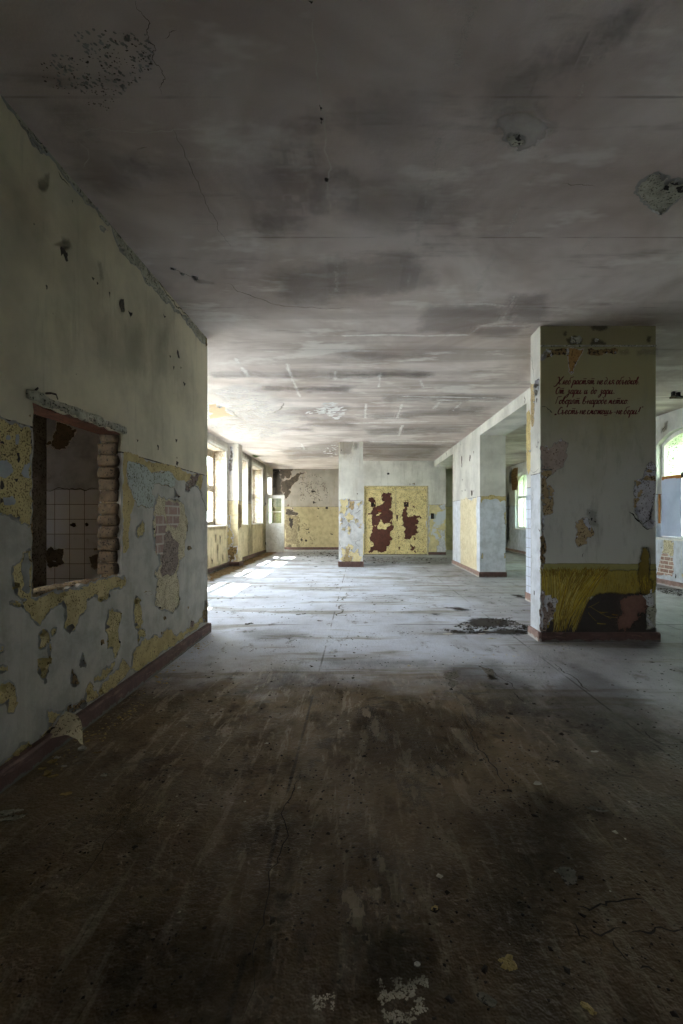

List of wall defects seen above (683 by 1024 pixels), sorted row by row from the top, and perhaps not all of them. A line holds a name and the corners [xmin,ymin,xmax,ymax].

spalling [41,28,153,109]
spalling [633,171,683,215]
crack [170,267,198,281]
peeling [0,416,33,528]
peeling [9,389,208,751]
peeling [279,469,447,562]
peeling [460,378,569,570]
peeling [575,512,596,547]
peeling [630,461,657,530]